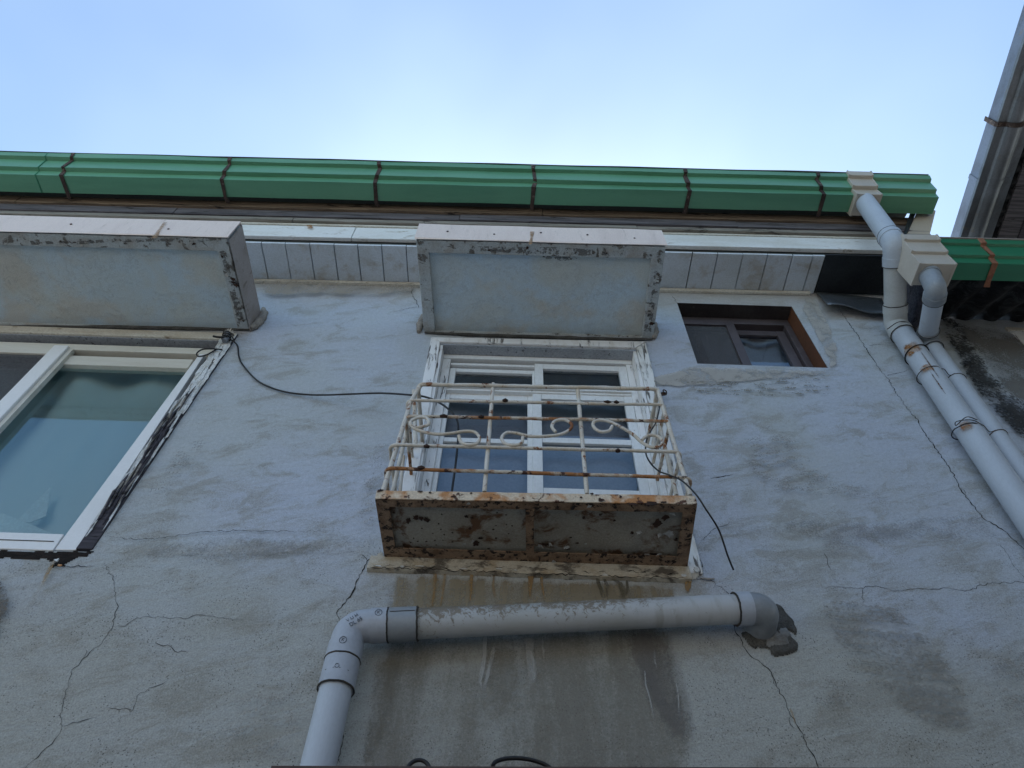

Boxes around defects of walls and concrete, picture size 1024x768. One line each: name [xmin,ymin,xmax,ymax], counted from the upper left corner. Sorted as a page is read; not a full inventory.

peeling [30,238,245,323]
peeling [472,246,614,261]
peeling [644,274,662,332]
water stain [942,316,1024,438]
crack [824,308,1024,600]
crack [336,555,686,618]
water stain [394,577,673,608]
crack [25,565,243,768]
water stain [513,628,686,767]
crack [734,626,819,768]